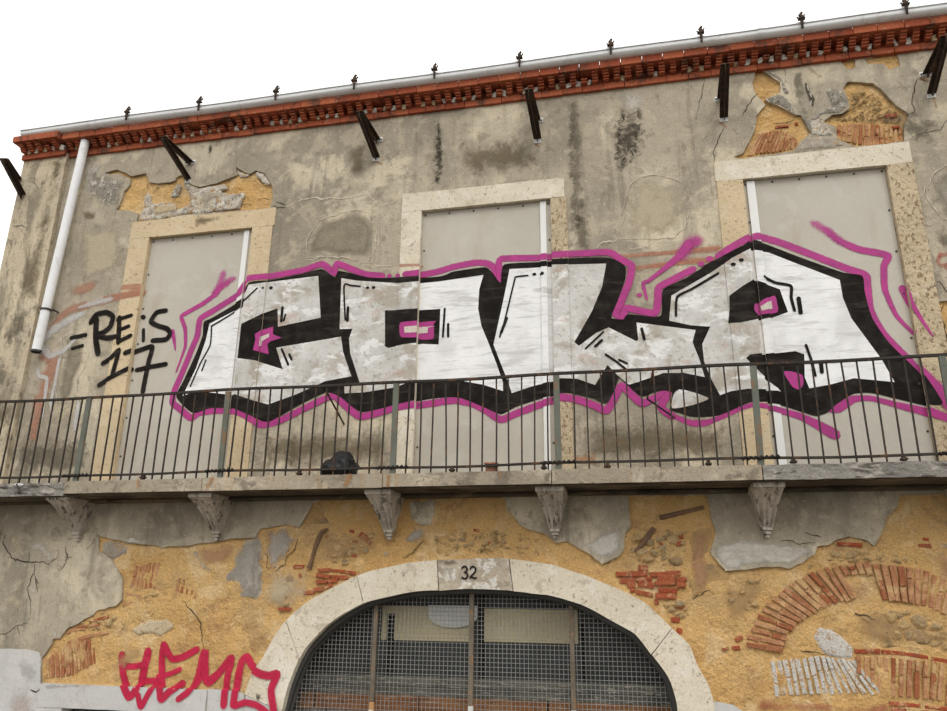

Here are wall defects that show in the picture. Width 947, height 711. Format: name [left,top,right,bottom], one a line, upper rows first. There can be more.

leakage [615,94,641,165]
flaking render [736,73,810,159]
flaking render [825,83,908,147]
flaking render [88,166,273,222]
flaking render [939,302,947,341]
crack [0,537,73,638]
flaking render [42,494,947,711]